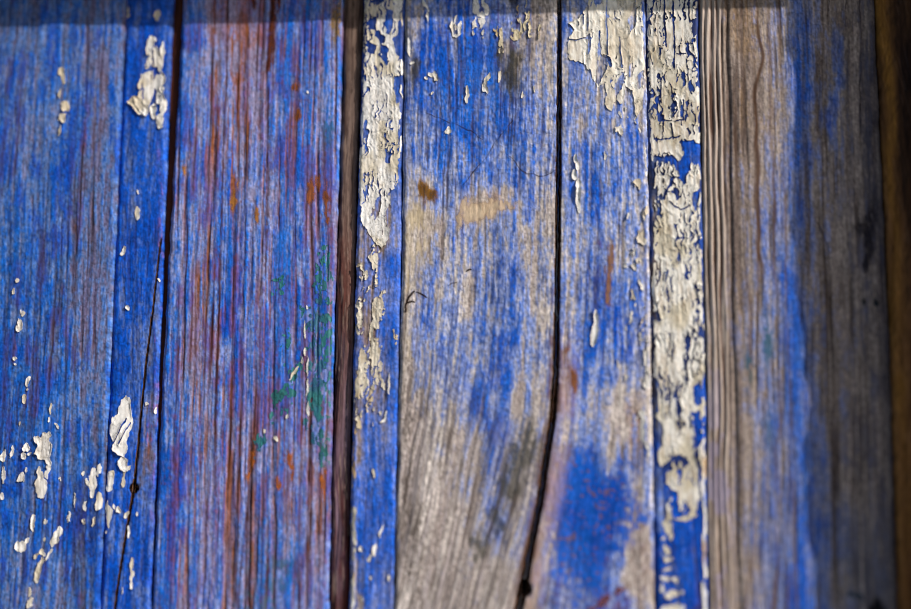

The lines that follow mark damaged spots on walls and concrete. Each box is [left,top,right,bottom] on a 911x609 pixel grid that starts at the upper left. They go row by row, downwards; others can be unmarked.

peeling [127,35,167,129]
peeling [482,71,501,94]
peeling [352,0,414,489]
crack [511,0,562,609]
peeling [568,0,707,609]
peeling [0,403,59,500]
peeling [14,396,138,609]
crack [114,239,162,609]
peeling [350,574,363,609]
peeling [351,506,383,562]